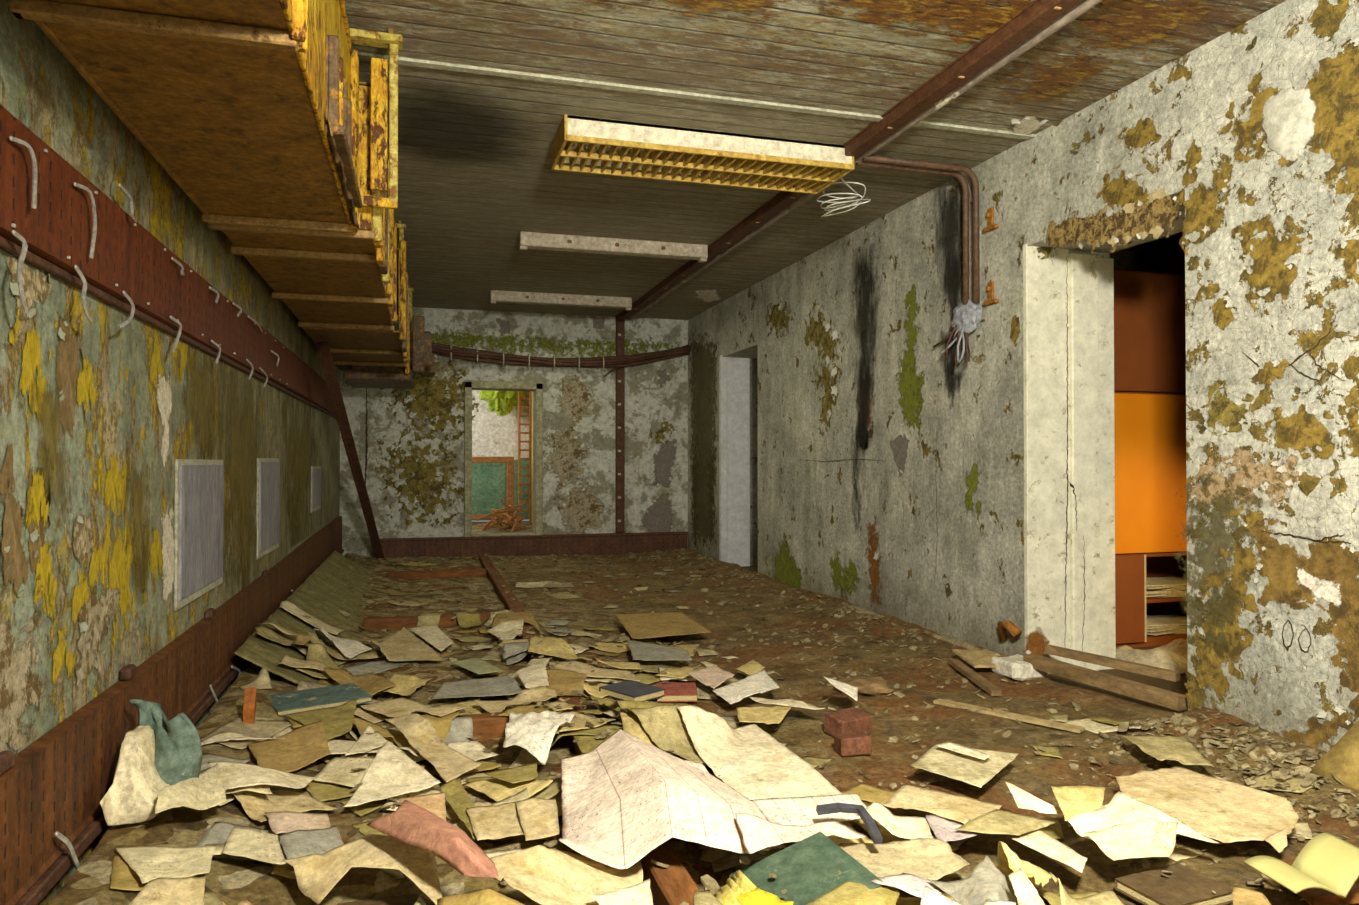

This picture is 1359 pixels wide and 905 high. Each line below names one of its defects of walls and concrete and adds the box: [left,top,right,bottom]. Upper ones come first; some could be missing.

peeling [6,256,55,321]
damp [936,185,966,399]
spalling [1036,115,1314,330]
peeling [1224,36,1359,303]
peeling [0,411,52,597]
peeling [156,373,173,467]
peeling [375,355,479,531]
peeling [543,371,612,534]
peeling [641,421,677,532]
damp [853,252,878,524]
damp [912,360,925,447]
peeling [0,605,46,757]